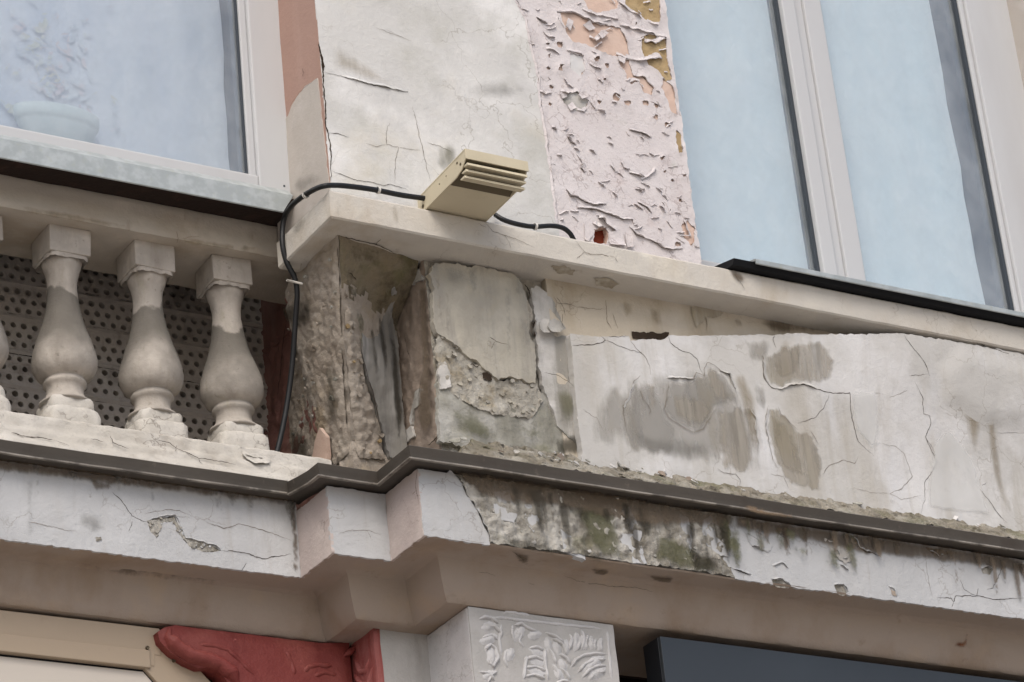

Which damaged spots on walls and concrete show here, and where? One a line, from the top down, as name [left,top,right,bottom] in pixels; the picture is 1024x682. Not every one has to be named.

crack [293,44,451,188]
crack [514,0,559,223]
peeling [522,0,700,250]
spalling [286,247,386,465]
spalling [434,335,543,419]
peeling [539,318,566,334]
peeling [551,265,575,275]
crack [762,335,938,512]
spalling [147,513,222,552]
crack [113,493,288,571]
spalling [457,475,735,577]
leakage [462,474,1024,595]